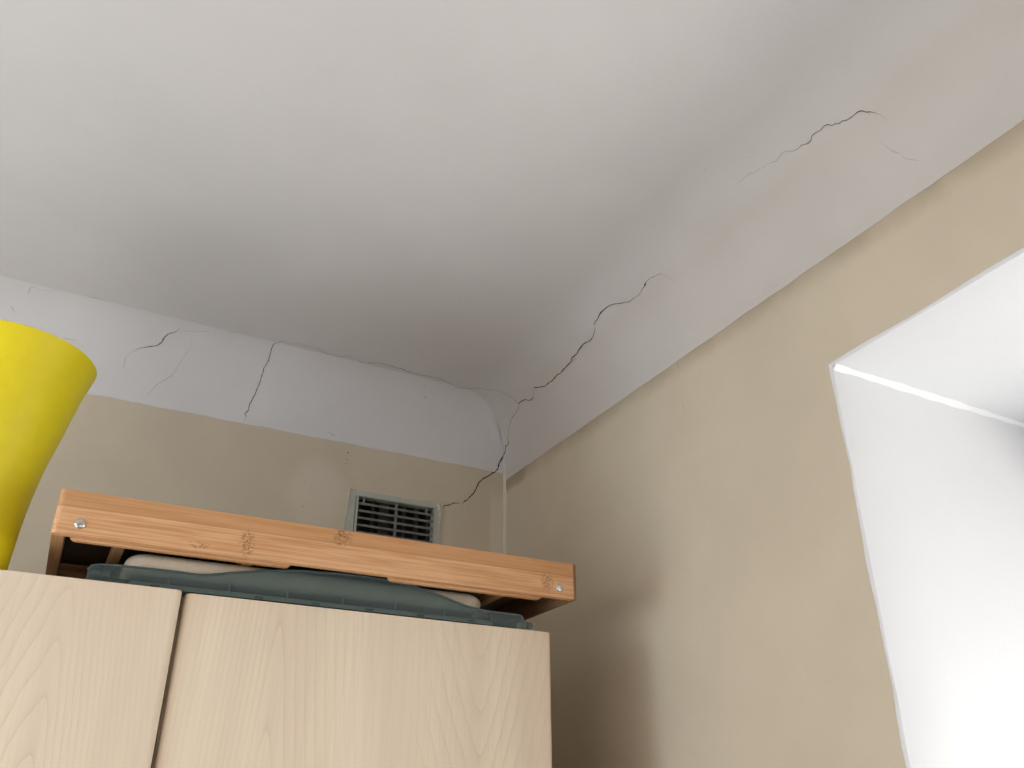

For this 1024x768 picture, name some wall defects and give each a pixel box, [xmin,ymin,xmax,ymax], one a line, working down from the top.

crack [784,110,875,152]
crack [313,274,659,507]